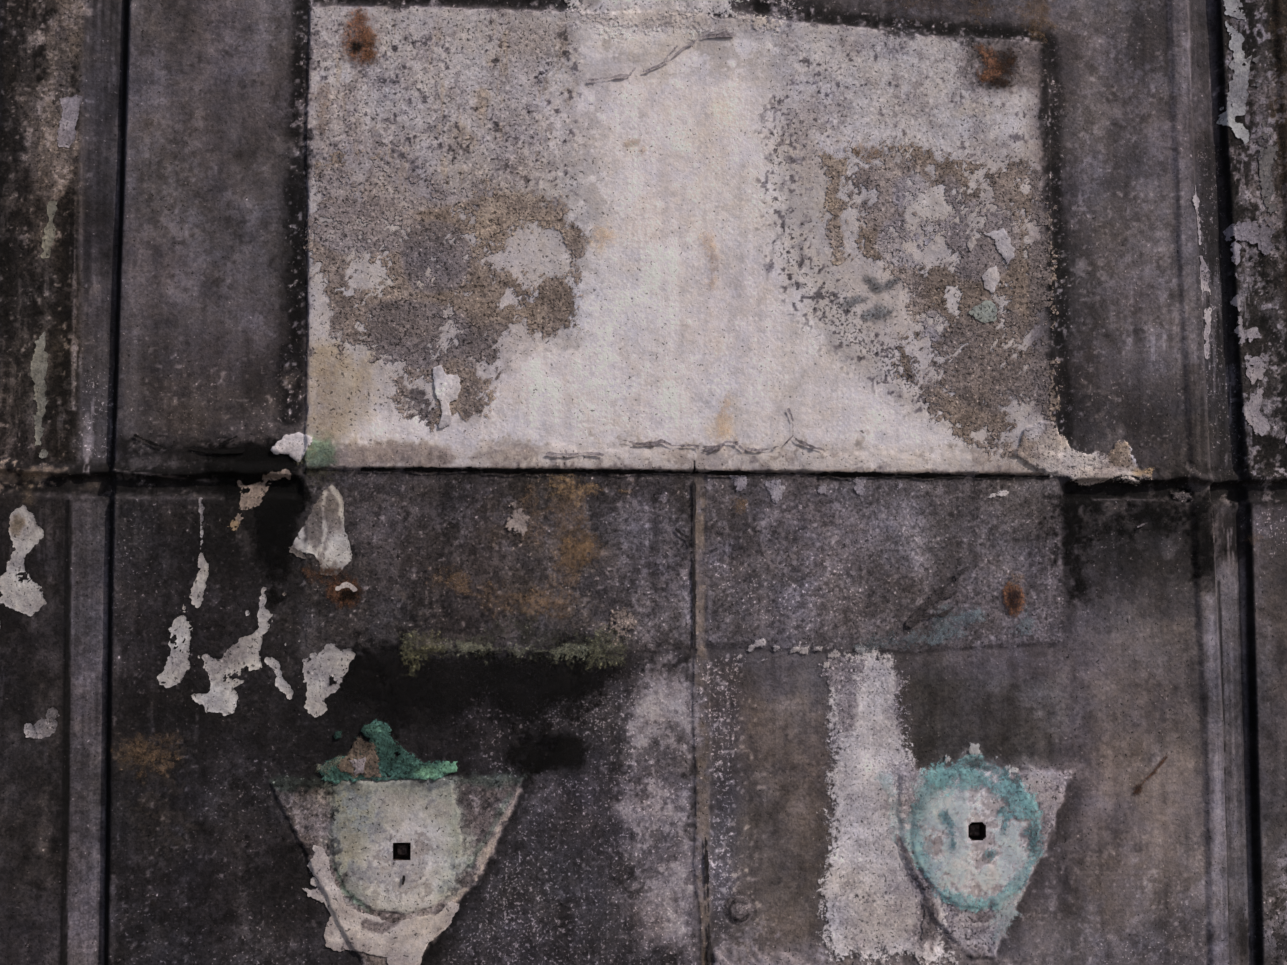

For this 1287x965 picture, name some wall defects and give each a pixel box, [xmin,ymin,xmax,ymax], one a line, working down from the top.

rust [341,8,377,65]
rust [976,44,1020,89]
peeling [1216,0,1282,279]
flaking render [304,146,591,435]
flaking render [819,138,1155,486]
peeling [1230,295,1270,436]
peeling [227,432,313,531]
peeling [0,505,47,616]
peeling [157,484,355,717]
rust [302,563,361,608]
rust [1003,582,1025,617]
damp [318,607,645,784]